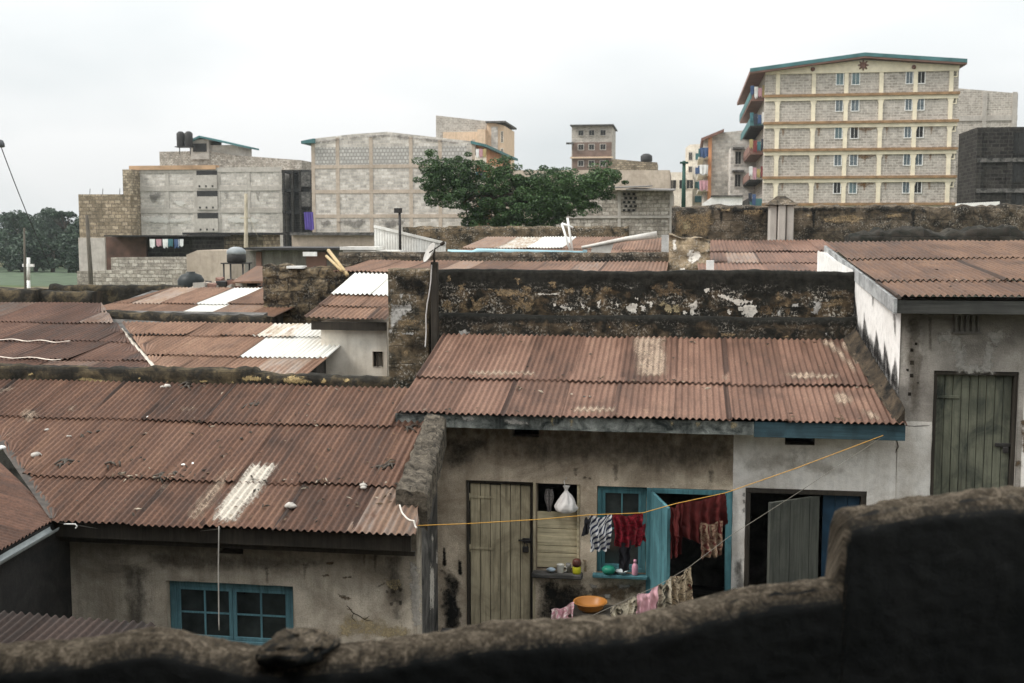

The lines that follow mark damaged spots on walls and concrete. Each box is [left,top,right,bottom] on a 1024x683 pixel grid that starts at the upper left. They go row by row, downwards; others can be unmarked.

peeling [615,297,653,314]
peeling [683,288,758,317]
leakage [853,292,919,397]
rust [194,482,223,518]
leakage [442,548,462,628]